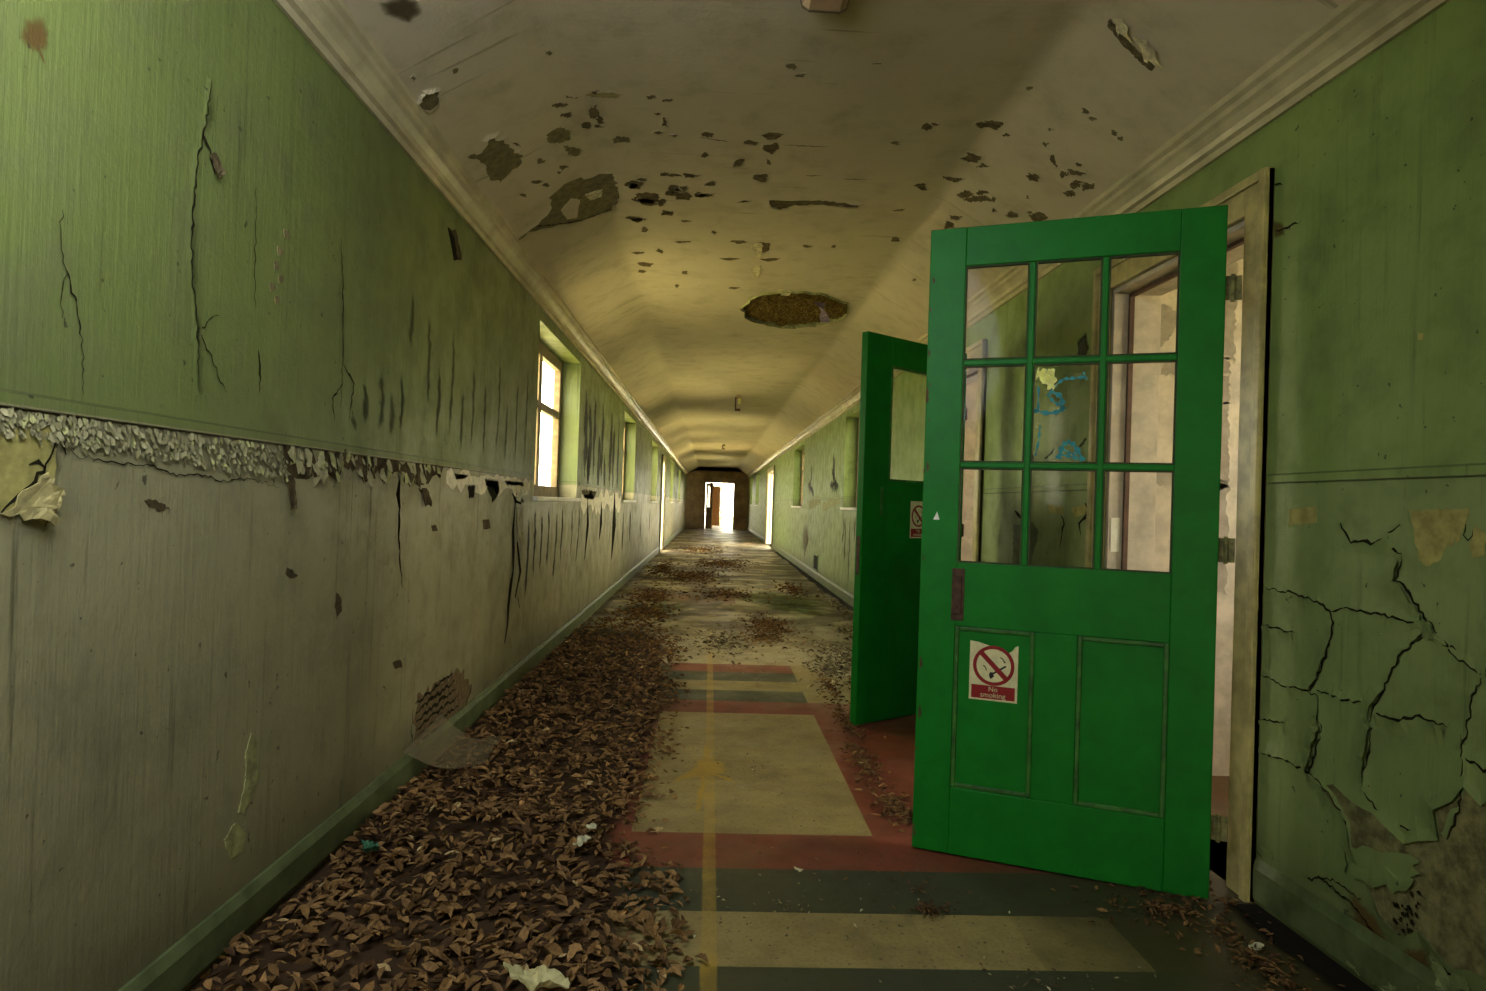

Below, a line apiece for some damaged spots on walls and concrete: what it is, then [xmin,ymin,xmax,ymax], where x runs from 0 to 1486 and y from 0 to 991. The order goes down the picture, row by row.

peeling [409,67,460,114]
peeling [461,90,867,273]
peeling [972,118,1011,137]
peeling [911,126,1098,229]
peeling [1080,107,1124,142]
crack [183,75,261,397]
peeling [448,227,462,261]
peeling [710,230,782,290]
peeling [0,407,530,643]
crack [1258,512,1486,872]